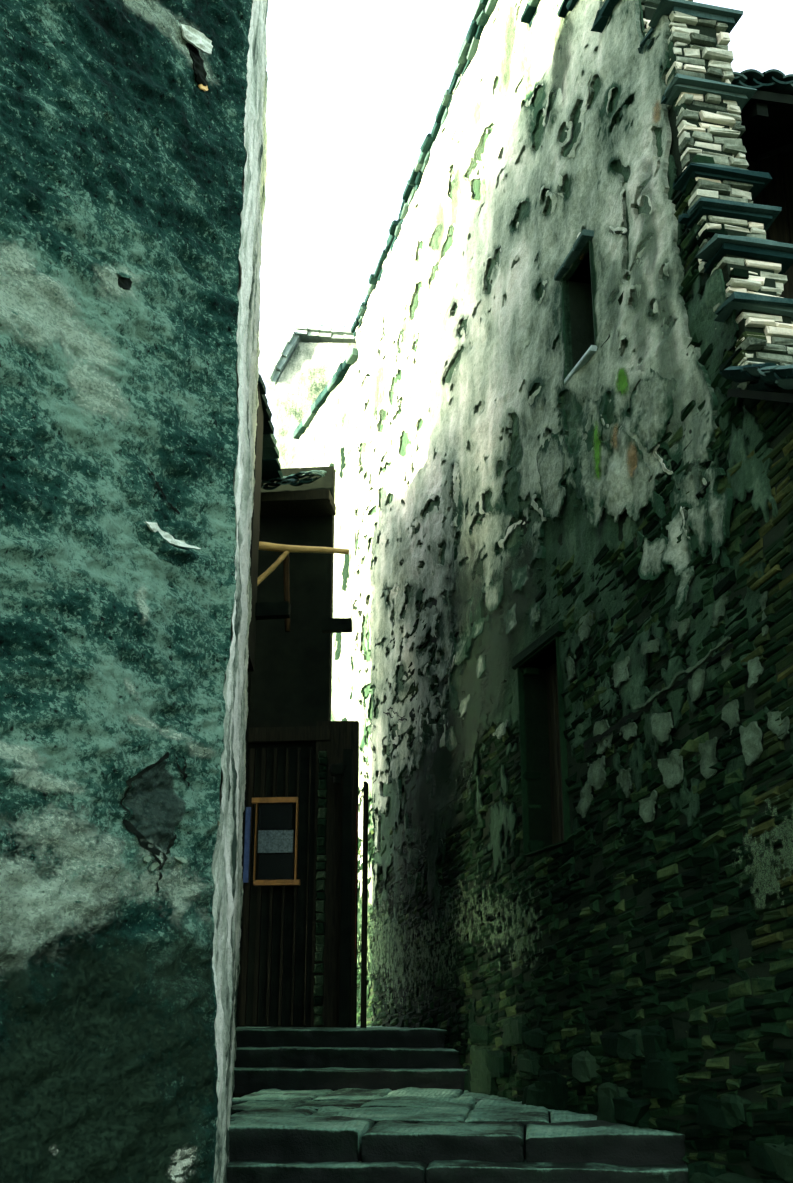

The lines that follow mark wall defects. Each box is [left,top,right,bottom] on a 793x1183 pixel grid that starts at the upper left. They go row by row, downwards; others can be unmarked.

flaking render [180,24,213,91]
flaking render [559,74,619,159]
flaking render [609,160,657,308]
flaking render [440,299,470,385]
flaking render [342,528,362,592]
flaking render [416,462,460,527]
flaking render [479,368,728,641]
flaking render [335,613,407,746]
flaking render [386,564,540,769]
flaking render [120,752,189,871]
flaking render [575,712,684,823]
flaking render [698,699,790,779]